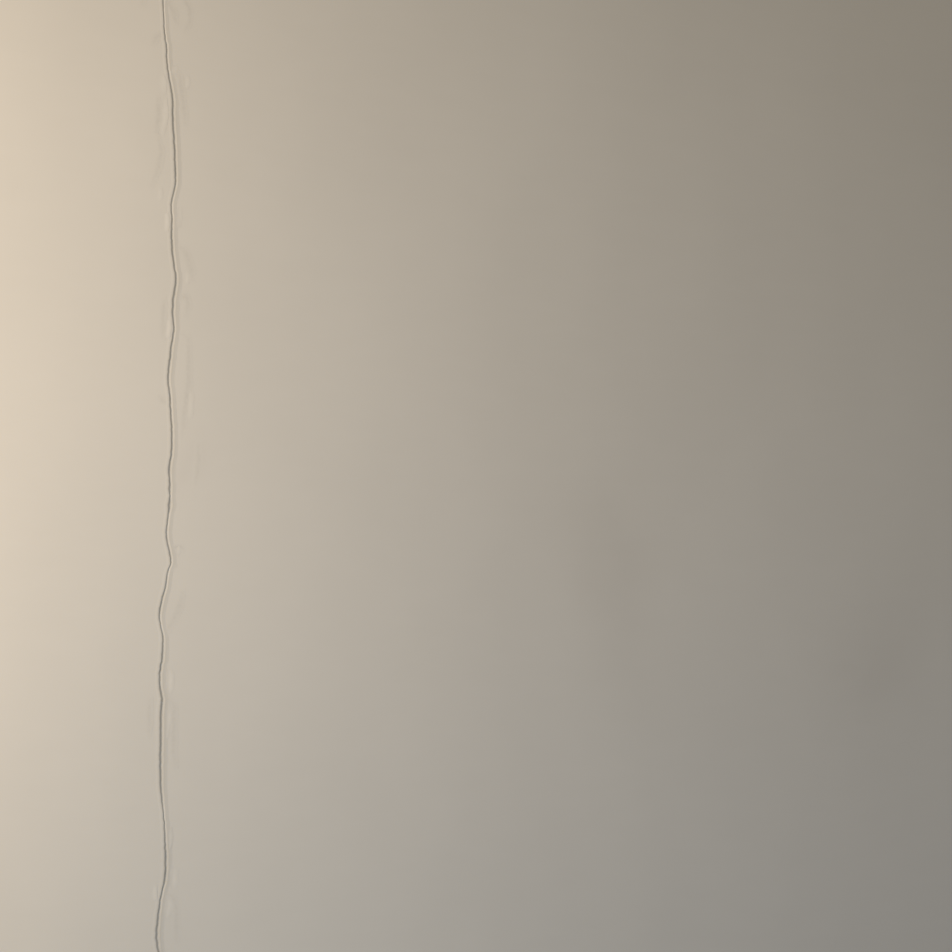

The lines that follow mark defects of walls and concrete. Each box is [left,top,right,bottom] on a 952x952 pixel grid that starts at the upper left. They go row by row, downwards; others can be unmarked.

crack [138,0,204,952]